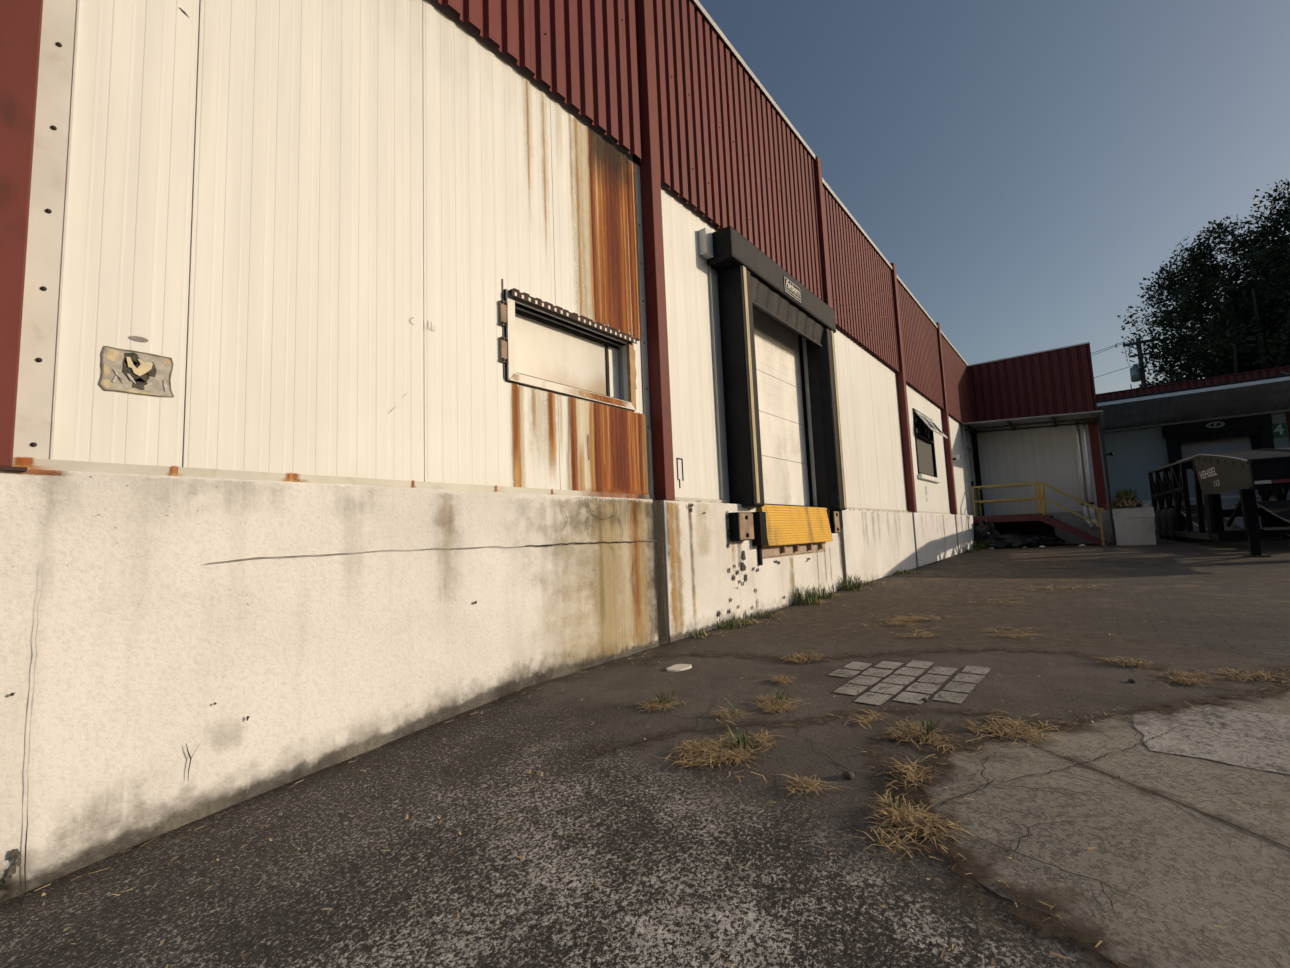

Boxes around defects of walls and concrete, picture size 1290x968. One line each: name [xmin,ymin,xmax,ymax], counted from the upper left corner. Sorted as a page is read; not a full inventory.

rust [527,81,546,209]
rust [573,119,642,339]
rust [512,384,654,499]
crack [207,500,657,604]
damp [593,500,696,657]